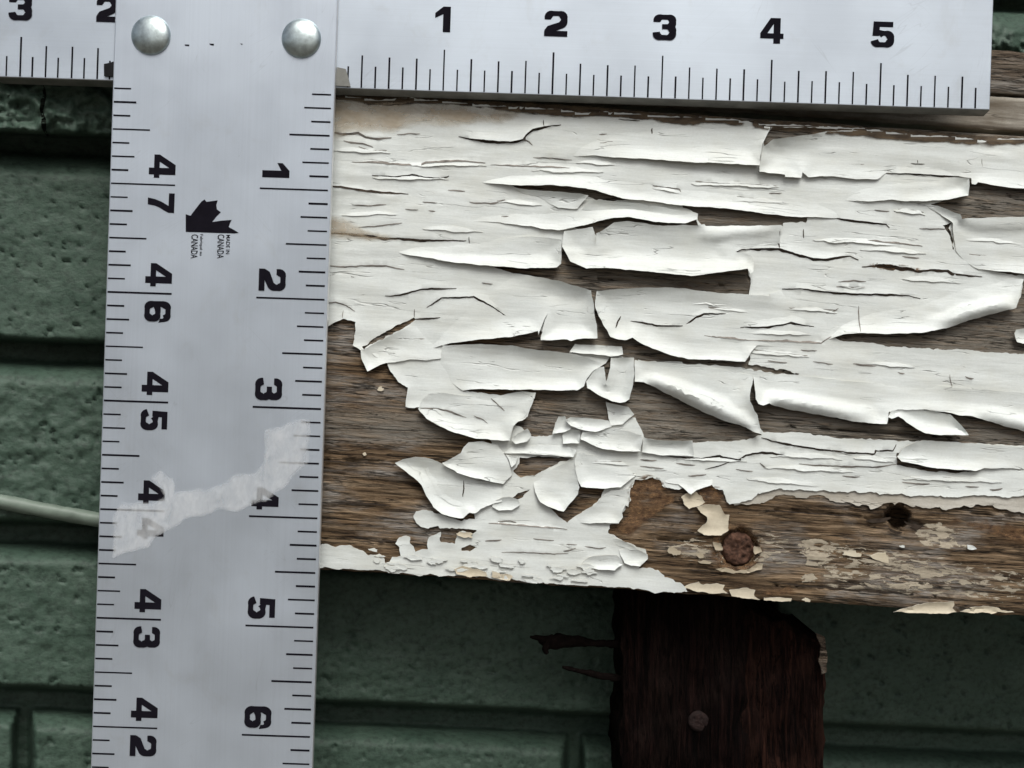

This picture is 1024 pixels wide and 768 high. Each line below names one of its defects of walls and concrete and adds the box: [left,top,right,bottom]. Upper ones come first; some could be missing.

peeling [361,125,1024,524]
peeling [368,538,648,584]
peeling [697,542,723,564]
corrosion [712,526,761,570]
peeling [729,588,811,602]
peeling [828,569,865,589]
peeling [886,581,933,591]
peeling [961,606,1013,614]